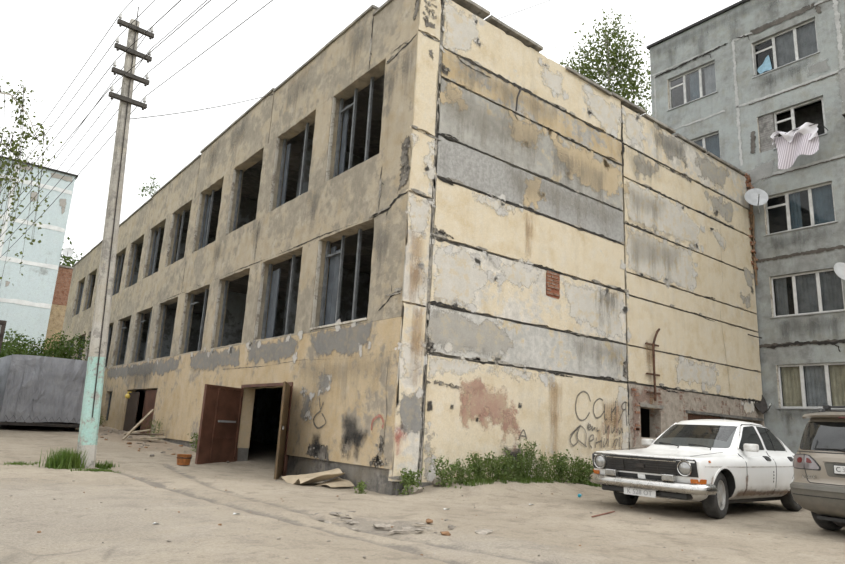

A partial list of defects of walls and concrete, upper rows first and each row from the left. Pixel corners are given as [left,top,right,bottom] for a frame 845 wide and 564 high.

peeling [413,0,481,112]
crack [165,0,760,483]
peeling [508,84,733,292]
damp [460,392,470,427]
peeling [395,133,632,482]
peeling [676,355,721,393]
peeling [742,398,755,414]
crack [767,339,845,352]